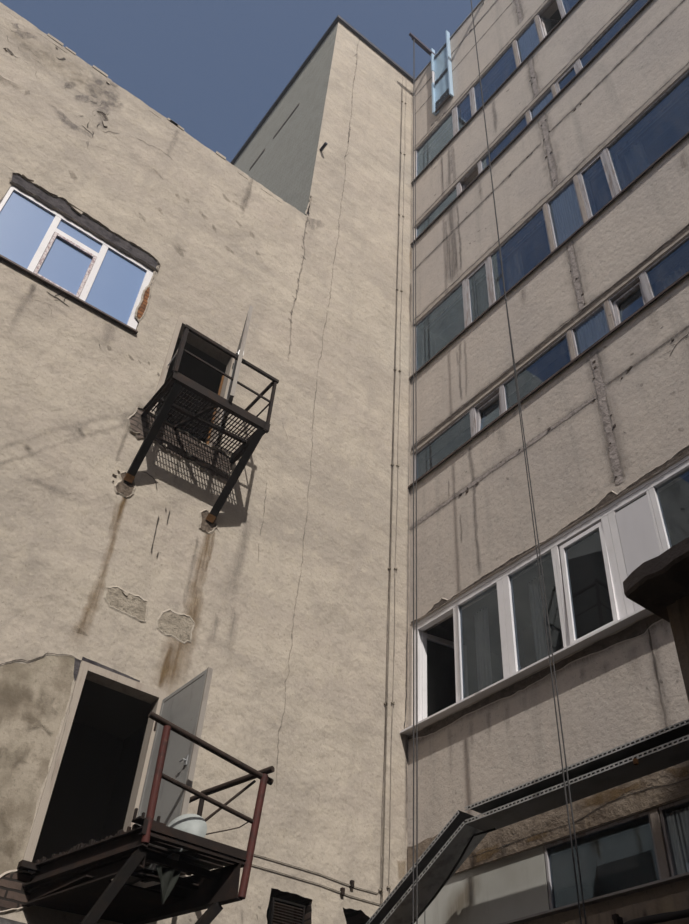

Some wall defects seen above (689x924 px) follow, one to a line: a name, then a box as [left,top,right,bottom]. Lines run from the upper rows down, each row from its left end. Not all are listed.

spalling [9,172,161,322]
flaking render [127,407,234,483]